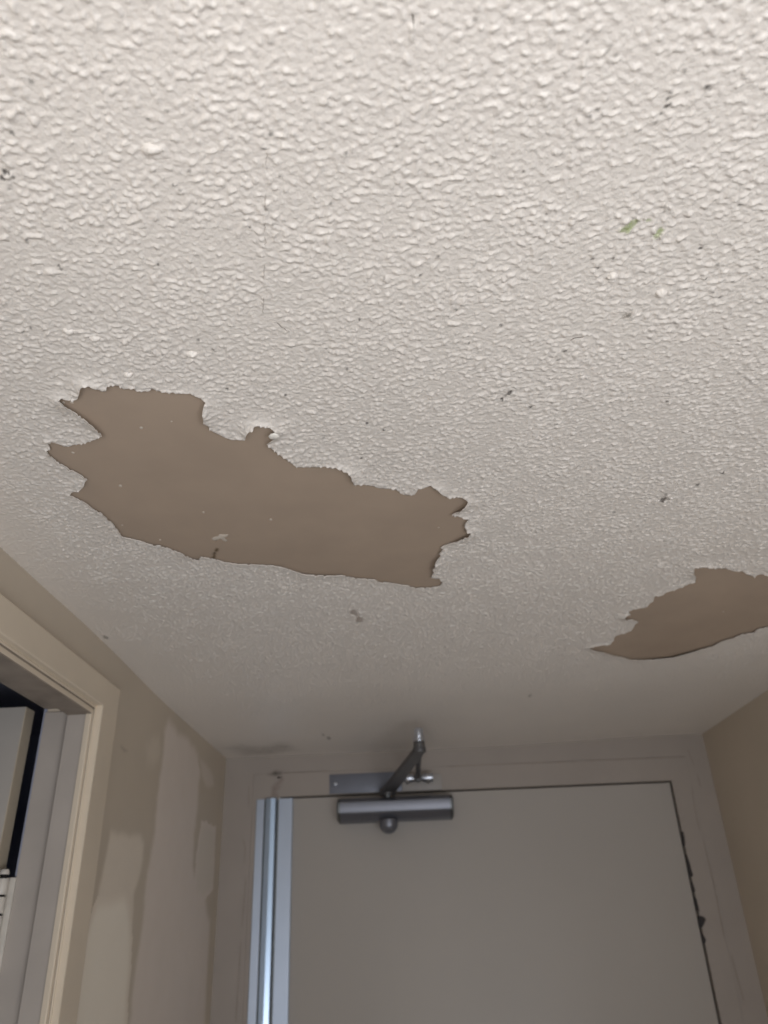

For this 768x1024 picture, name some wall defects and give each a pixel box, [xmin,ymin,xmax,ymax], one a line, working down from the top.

peeling [47,386,471,589]
peeling [590,568,768,661]